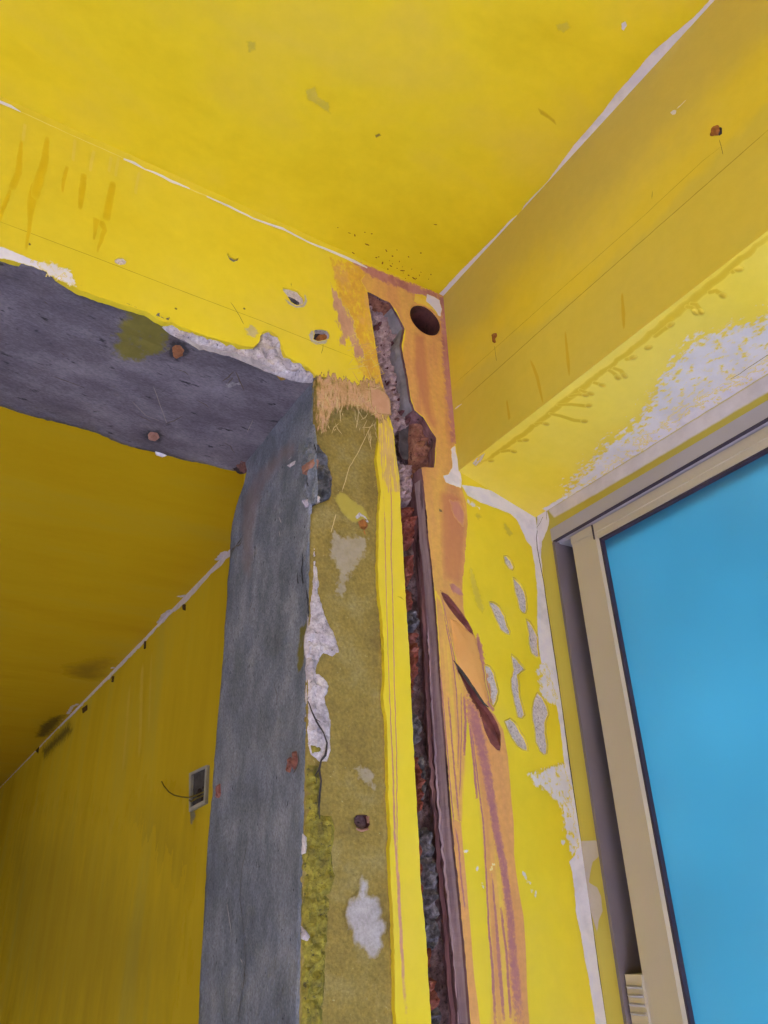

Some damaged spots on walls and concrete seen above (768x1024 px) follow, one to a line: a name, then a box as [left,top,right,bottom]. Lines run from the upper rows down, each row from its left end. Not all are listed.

leakage [0,122,50,250]
flaking render [162,324,313,390]
spalling [503,555,540,658]
flaking render [440,590,549,756]
flaking render [300,549,339,1024]